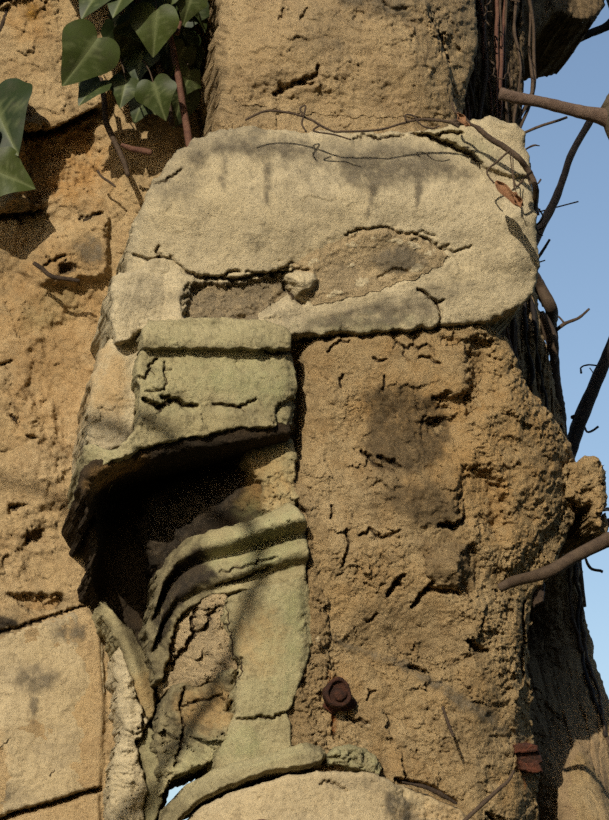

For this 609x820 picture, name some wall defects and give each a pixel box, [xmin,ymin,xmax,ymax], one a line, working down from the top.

crack [414,231,471,253]
crack [136,359,256,412]